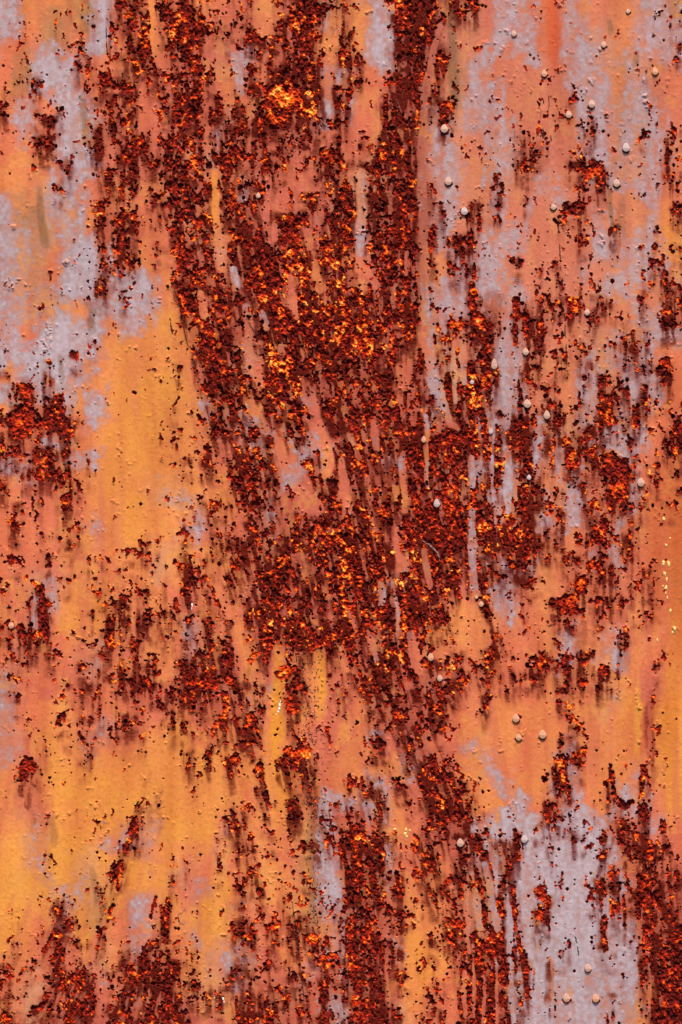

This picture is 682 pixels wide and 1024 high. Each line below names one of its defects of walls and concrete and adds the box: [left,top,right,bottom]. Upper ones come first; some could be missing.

rust [59,339,101,374]
rust [159,420,186,451]
rust [659,487,682,527]
rust [642,650,674,705]
rust [168,840,203,888]
rust [0,928,40,1024]